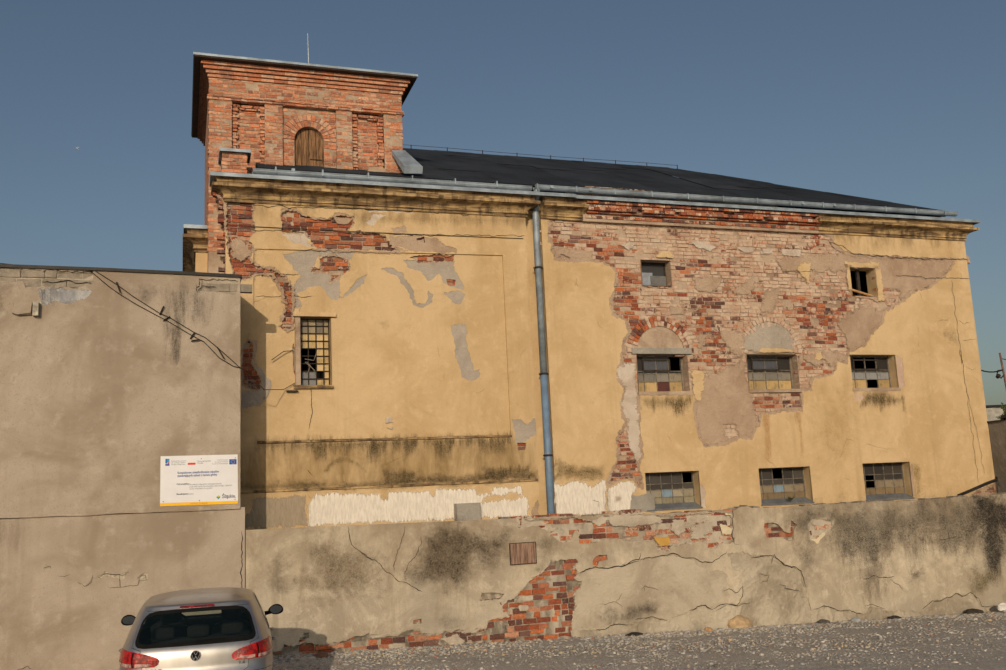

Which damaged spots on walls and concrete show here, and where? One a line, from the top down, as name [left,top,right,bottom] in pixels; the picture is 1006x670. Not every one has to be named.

flaking render [566,186,778,207]
flaking render [196,192,465,333]
crack [829,242,984,478]
flaking render [241,213,1000,656]
leakage [374,469,534,486]
crack [45,566,147,588]
crack [348,529,422,591]
leakage [422,530,500,582]
crack [580,511,734,573]
crack [693,554,884,614]
leakage [799,498,1006,589]